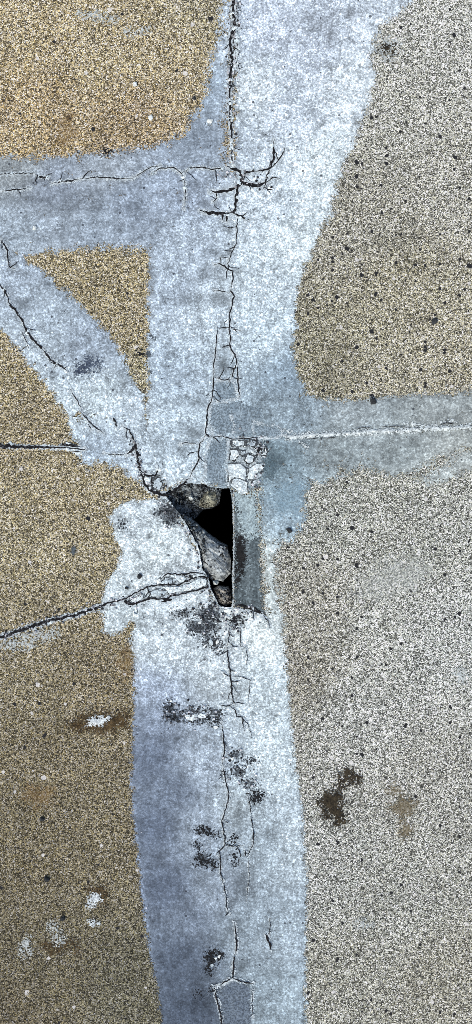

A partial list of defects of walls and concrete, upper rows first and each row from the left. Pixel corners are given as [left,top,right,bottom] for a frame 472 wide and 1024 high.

crack [0,0,288,499]
crack [0,570,214,641]
peeling [152,379,284,655]
crack [211,607,272,1024]
leakage [314,766,363,828]